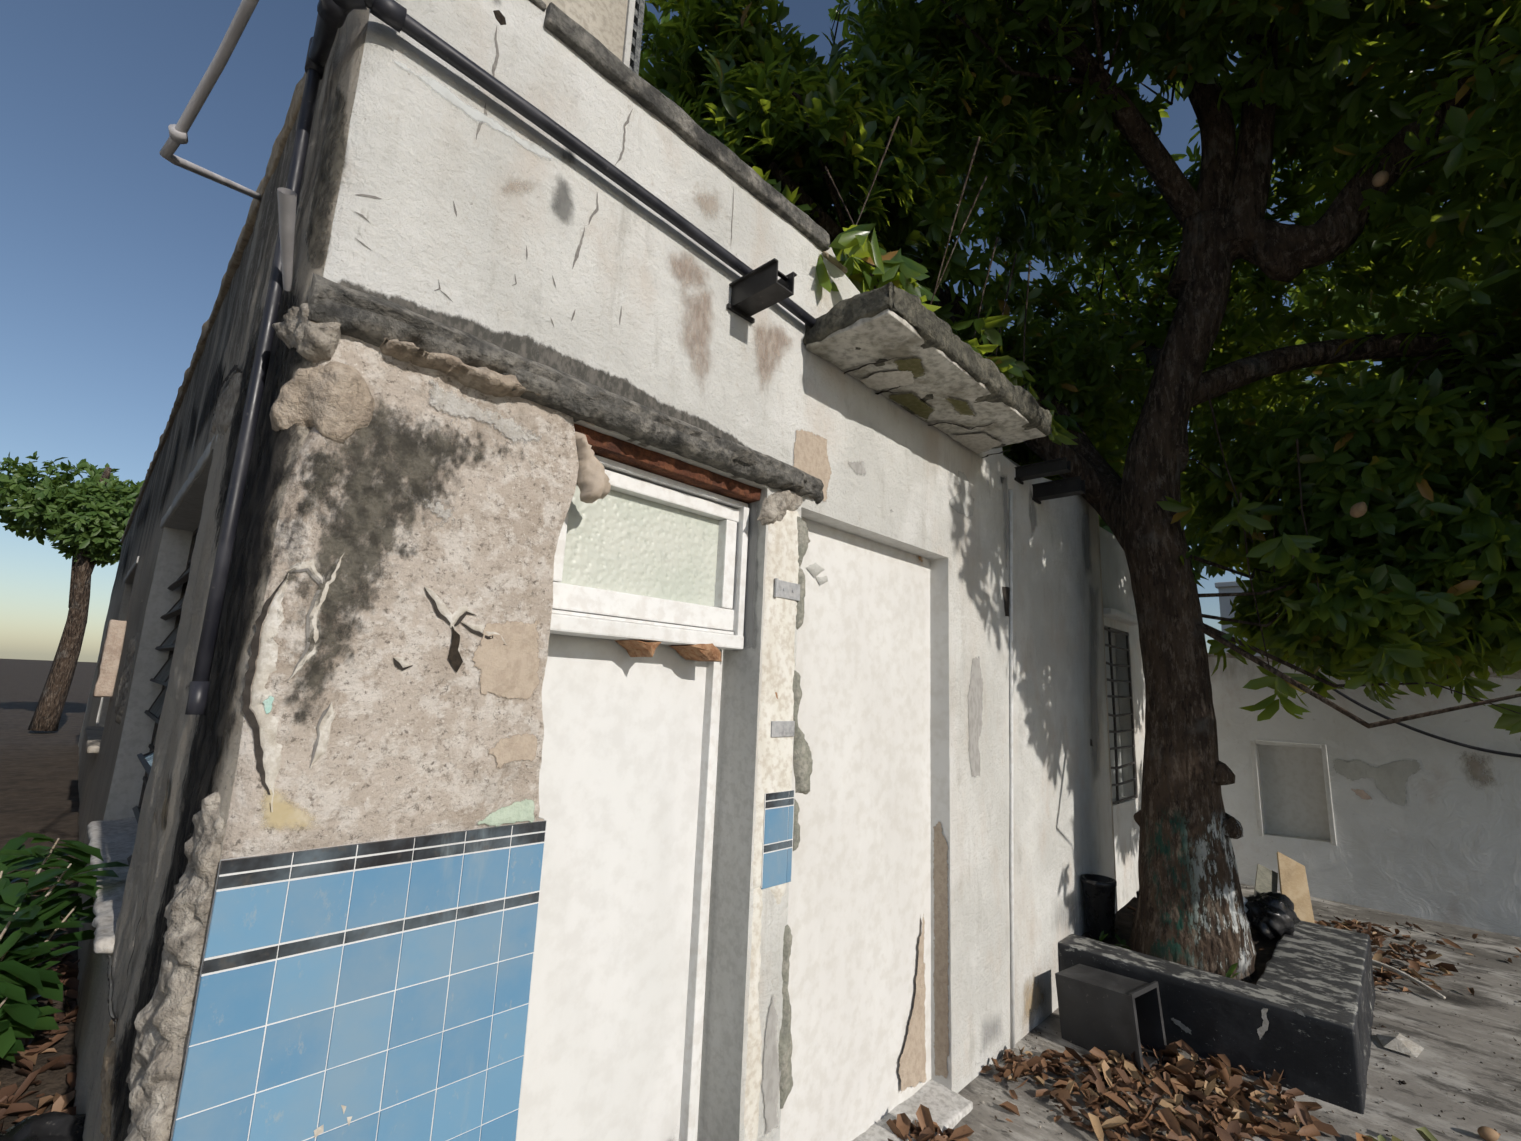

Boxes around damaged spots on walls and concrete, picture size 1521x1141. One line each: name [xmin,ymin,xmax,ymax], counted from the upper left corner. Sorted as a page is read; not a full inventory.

damp [306,88,346,266]
flaking render [269,361,375,444]
flaking render [379,337,541,397]
damp [338,279,750,449]
crack [242,552,344,812]
damp [110,285,542,1141]
crack [393,657,413,671]
crack [424,587,507,645]
peeling [478,799,535,826]
peeling [743,429,832,1141]
flaking render [100,790,224,1141]
peeling [899,822,949,1093]